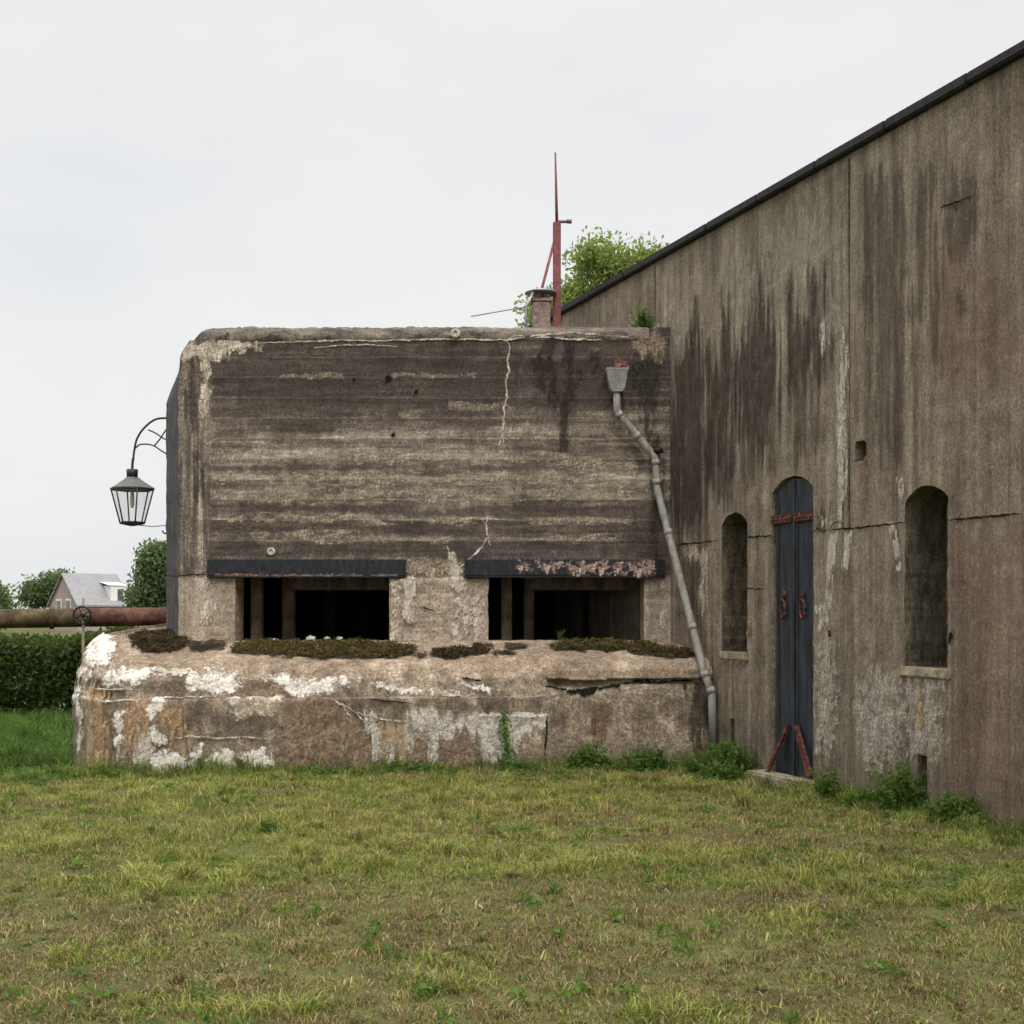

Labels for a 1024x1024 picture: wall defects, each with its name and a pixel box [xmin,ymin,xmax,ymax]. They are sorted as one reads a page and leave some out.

crack [254,331,630,448]
water stain [531,335,603,452]
water stain [612,252,852,580]
crack [455,516,490,573]
peeling [516,558,656,578]
crack [676,539,717,547]
crack [811,521,906,540]
water stain [889,522,901,570]
crack [949,513,1022,521]
water stain [814,593,832,631]
spalling [72,632,374,773]
crack [545,677,701,697]